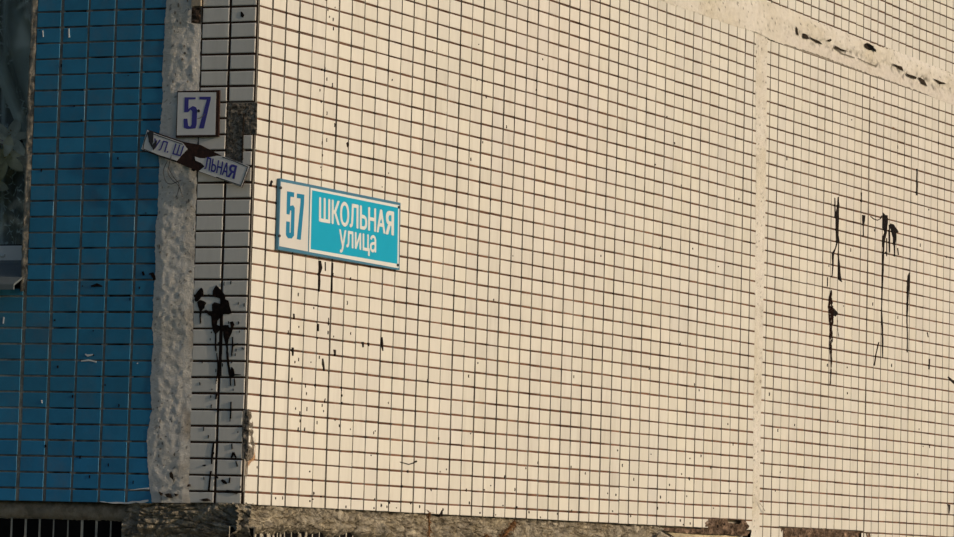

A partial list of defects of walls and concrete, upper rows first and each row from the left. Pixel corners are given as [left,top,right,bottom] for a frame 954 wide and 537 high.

peeling [226,103,257,163]
leakage [827,197,842,385]
leakage [870,215,899,366]
spalling [780,527,881,537]